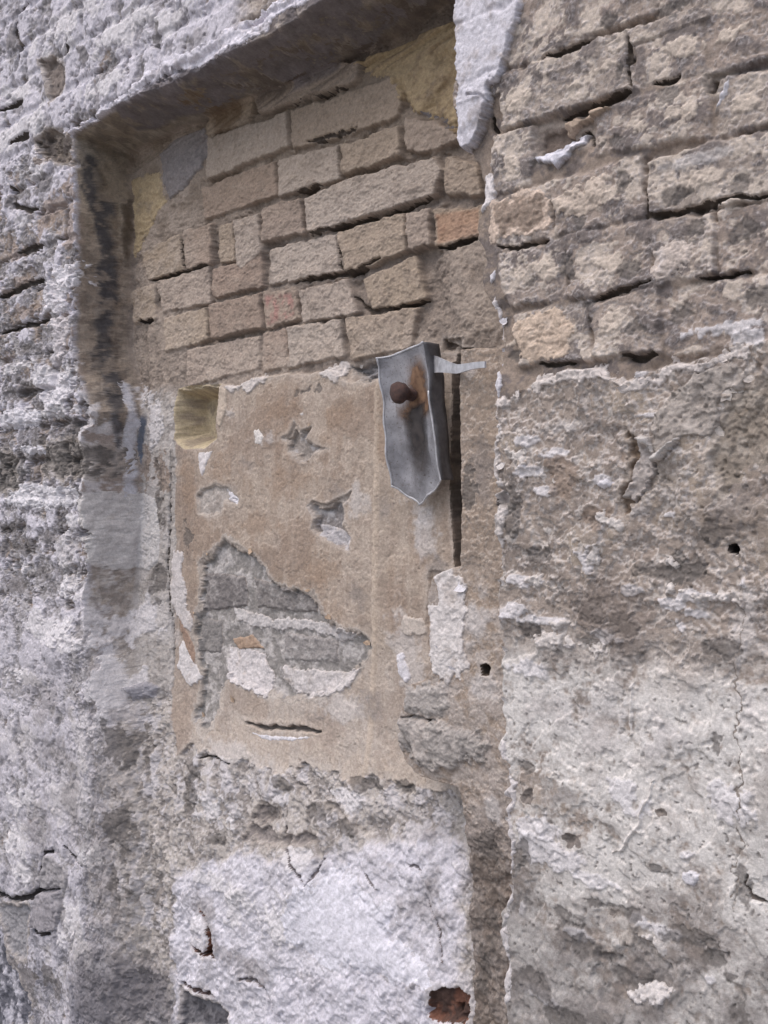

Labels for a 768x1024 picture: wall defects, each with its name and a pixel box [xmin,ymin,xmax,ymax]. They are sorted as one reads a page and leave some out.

flaking render [216,373,269,427]
flaking render [254,429,264,445]
spalling [280,412,329,463]
rust [401,363,429,472]
flaking render [0,435,373,737]
crack [248,722,322,741]
crack [730,554,768,928]
crack [0,845,83,901]
crack [34,929,51,937]